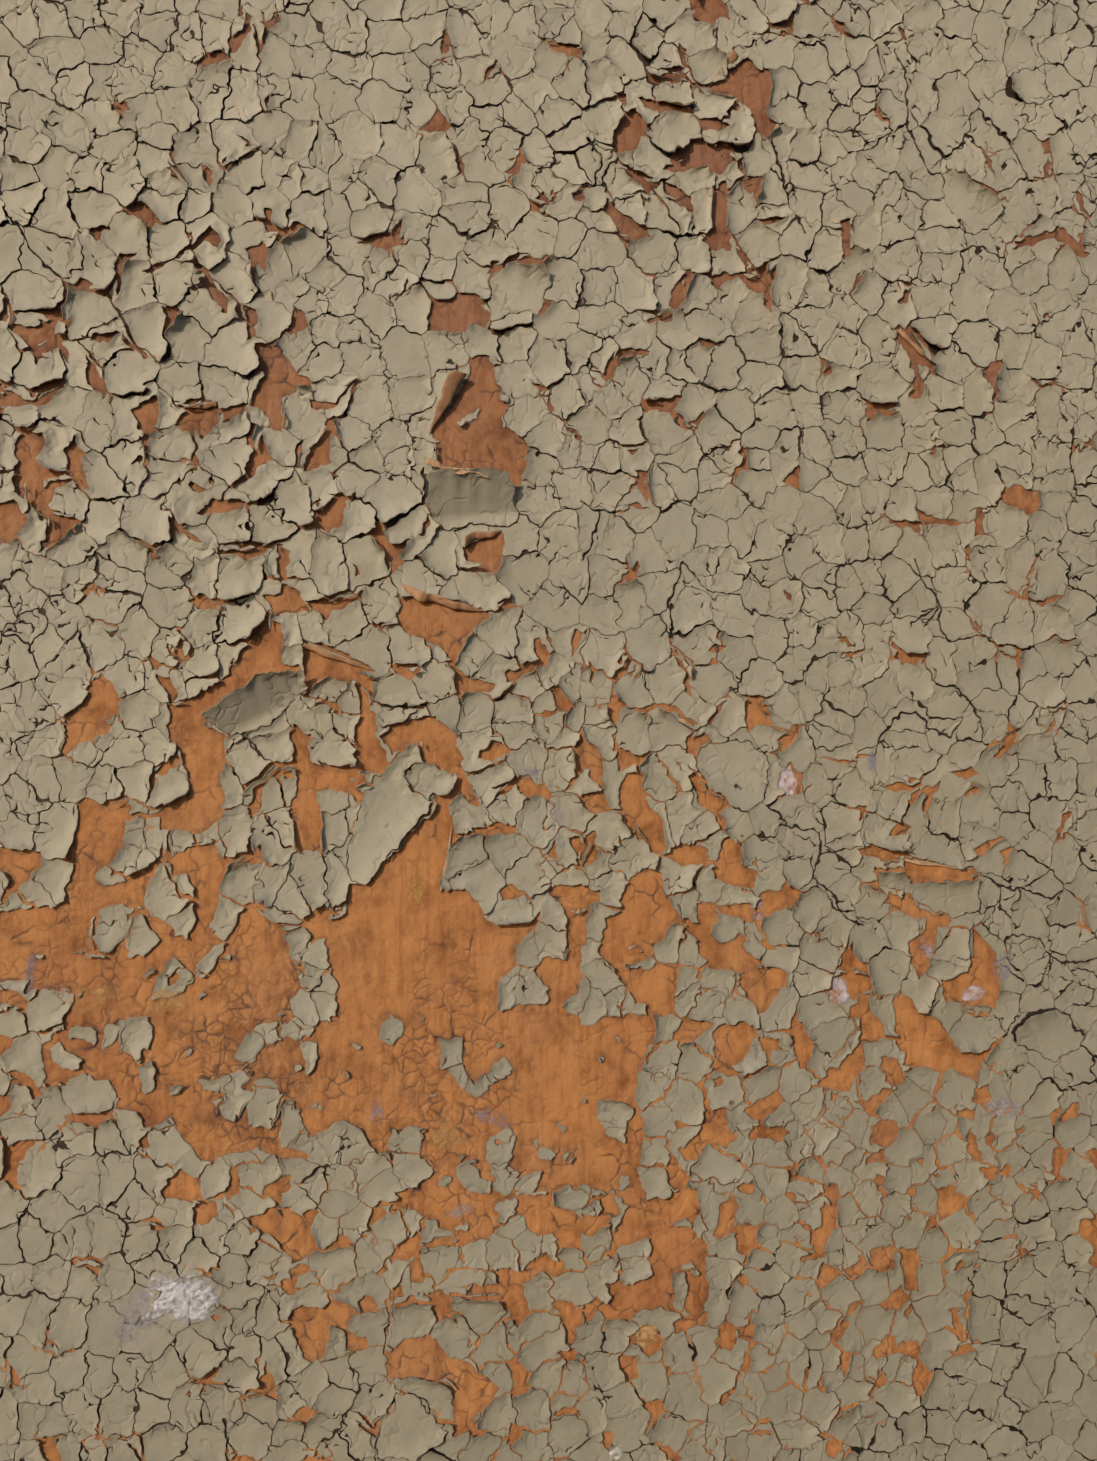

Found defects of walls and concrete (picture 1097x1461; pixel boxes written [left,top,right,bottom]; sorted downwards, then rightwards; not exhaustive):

peeling [530,0,874,260]
crack [0,0,1097,1116]
peeling [0,104,1097,1255]
crack [0,1251,342,1461]
peeling [317,1432,355,1461]
crack [548,1323,824,1461]
crack [960,1228,1097,1461]